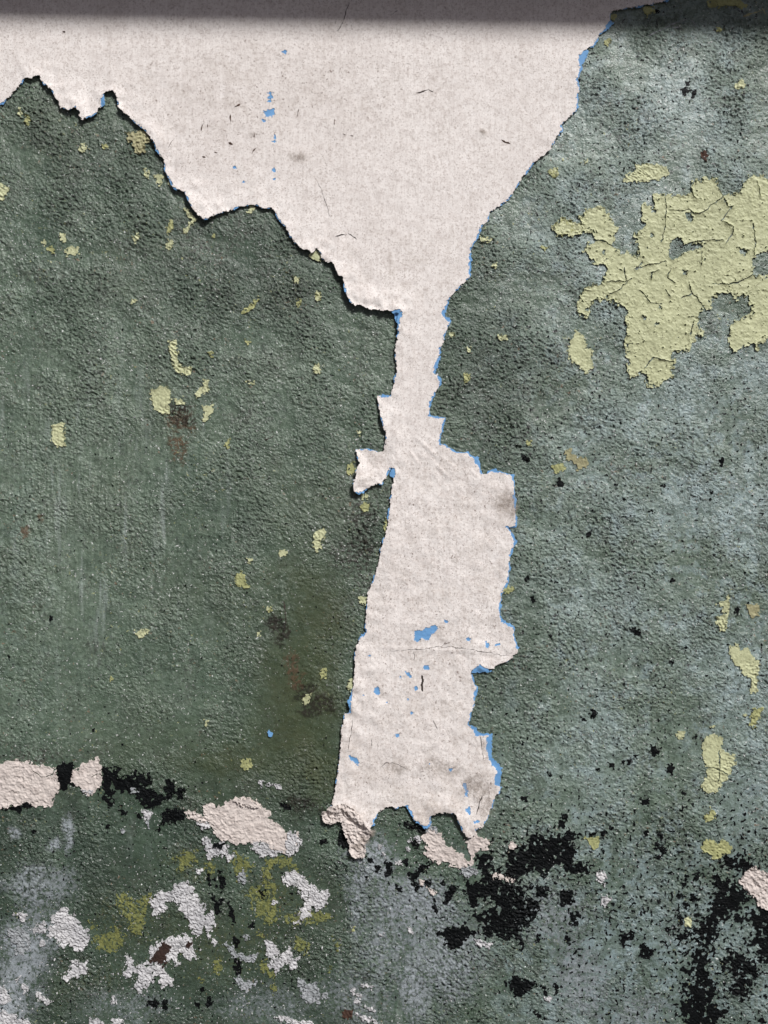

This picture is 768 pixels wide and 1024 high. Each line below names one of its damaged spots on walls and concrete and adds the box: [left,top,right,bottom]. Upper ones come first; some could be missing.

crack [613,192,755,304]
peeling [0,0,670,881]
peeling [87,891,153,953]
peeling [143,996,168,1010]
peeling [167,849,334,1012]
peeling [657,839,768,1024]